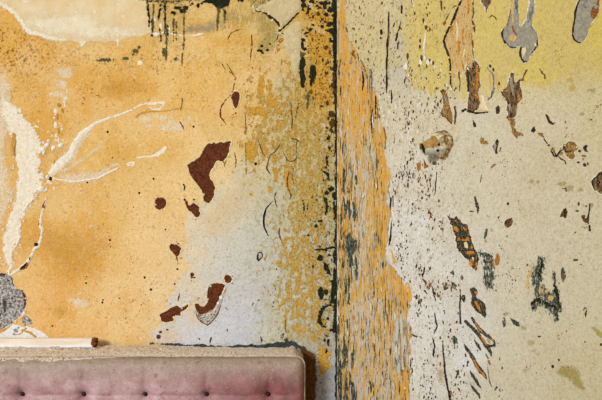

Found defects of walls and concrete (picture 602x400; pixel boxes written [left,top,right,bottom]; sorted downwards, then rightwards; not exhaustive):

leakage [0,0,281,101]
peeling [571,0,601,44]
peeling [178,0,539,400]
spalling [0,273,33,329]
spalling [156,274,234,339]